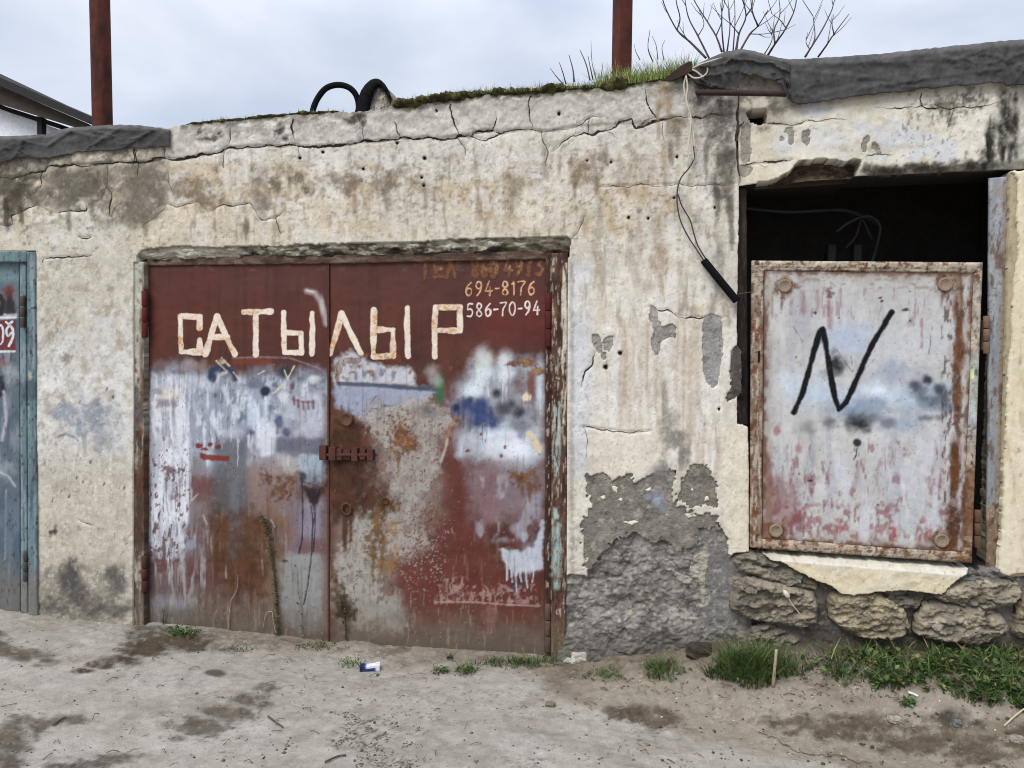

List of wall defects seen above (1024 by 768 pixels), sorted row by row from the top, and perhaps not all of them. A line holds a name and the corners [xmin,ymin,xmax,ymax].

leakage [0,165,41,225]
leakage [119,166,215,219]
crack [2,89,845,239]
leakage [863,163,946,175]
crack [876,93,991,127]
leakage [964,91,1018,170]
peeling [649,306,676,355]
peeling [702,314,742,402]
corrosion [929,275,964,550]
corrosion [323,423,397,576]
corrosion [509,470,541,499]
spalling [557,464,752,662]